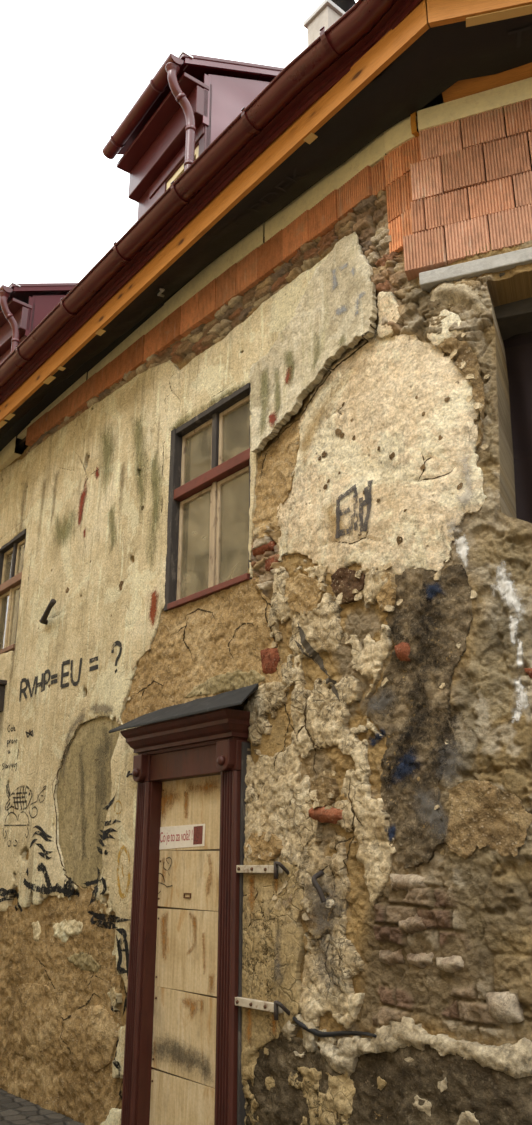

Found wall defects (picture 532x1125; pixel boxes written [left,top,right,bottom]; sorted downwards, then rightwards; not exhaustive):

spalling [439,333,490,450]
damp [41,474,75,543]
damp [103,420,161,561]
spalling [252,419,300,538]
crack [178,587,324,780]
spalling [0,563,532,1125]
crack [322,783,363,895]
damp [415,791,448,835]
crack [37,944,103,1070]
crack [323,927,342,999]